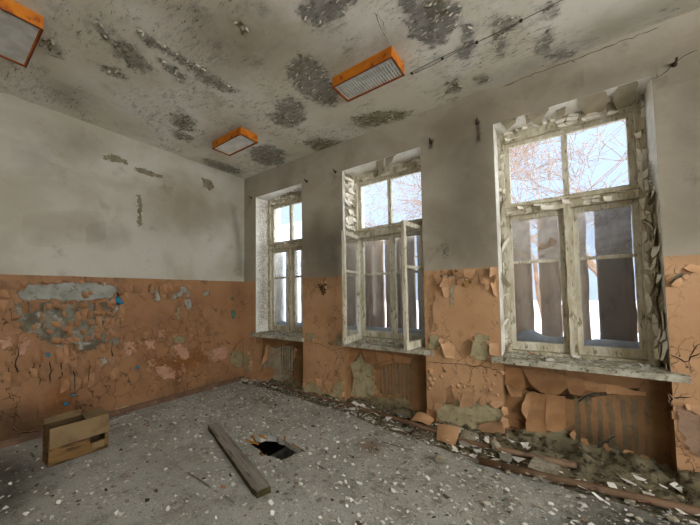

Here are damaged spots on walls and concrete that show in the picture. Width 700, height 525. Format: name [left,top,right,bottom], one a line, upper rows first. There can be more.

crack [501,27,659,88]
peeling [497,81,646,179]
peeling [101,154,164,178]
peeling [135,194,143,227]
peeling [344,154,421,232]
peeling [251,188,302,383]
peeling [425,148,700,373]
peeling [0,279,137,366]
crack [6,349,91,401]
peeling [136,330,191,381]
peeling [302,338,404,400]
crack [669,343,700,366]